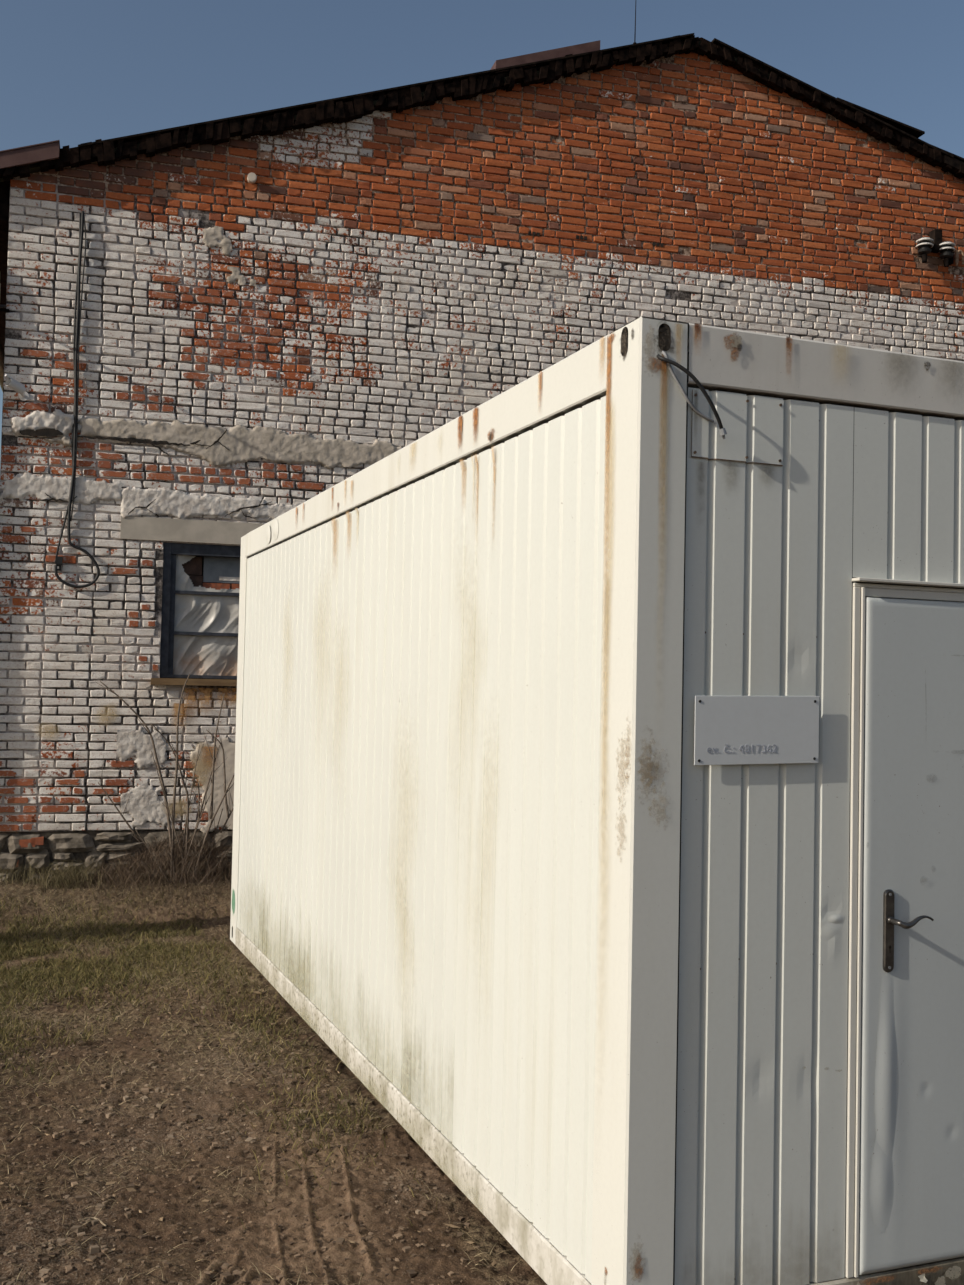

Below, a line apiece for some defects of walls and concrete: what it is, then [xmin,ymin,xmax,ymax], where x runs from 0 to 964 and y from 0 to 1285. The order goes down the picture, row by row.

peeling [152,226,297,388]
rust [724,333,742,361]
peeling [117,375,174,412]
rust [652,323,702,455]
rust [458,407,478,438]
crack [78,429,229,455]
spalling [4,394,323,490]
rust [460,449,495,482]
crack [225,497,272,518]
spalling [0,726,176,831]
spalling [185,737,235,833]
peeling [918,1266,962,1285]